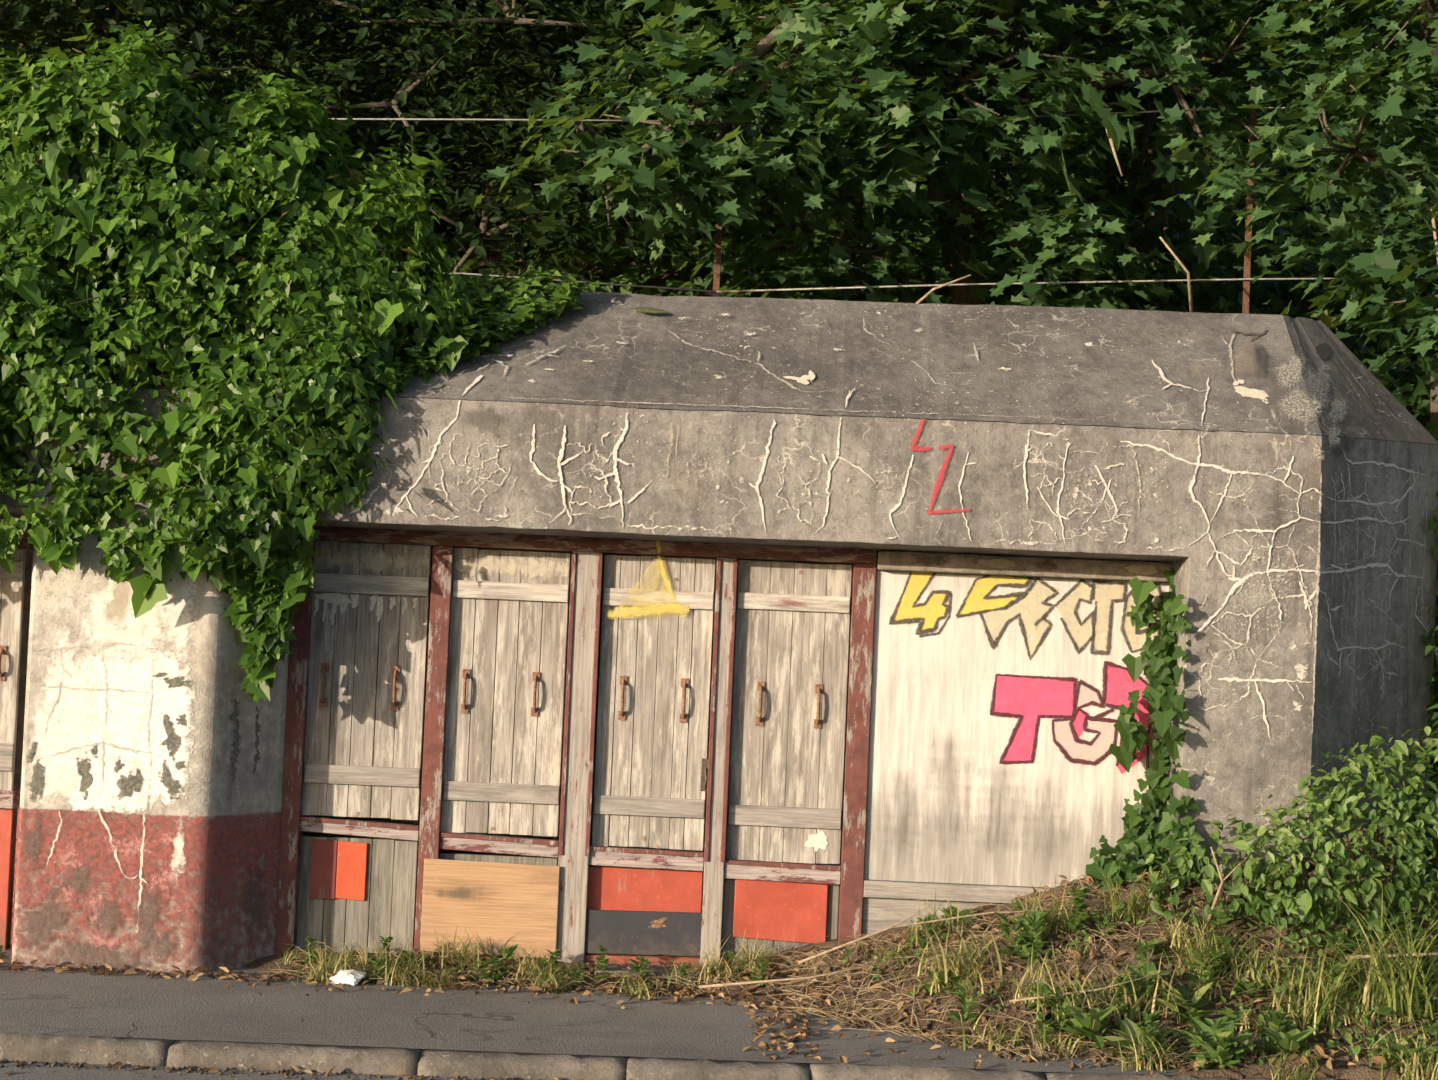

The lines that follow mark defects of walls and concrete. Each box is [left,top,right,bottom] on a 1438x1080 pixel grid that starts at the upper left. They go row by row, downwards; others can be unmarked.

peeling [27,553,197,813]
peeling [314,593,417,625]
crack [329,345,652,527]
crack [668,330,913,538]
crack [958,452,975,540]
crack [1023,328,1434,740]
peeling [53,845,122,950]
crack [29,643,187,933]
peeling [105,831,177,862]
peeling [150,865,178,891]